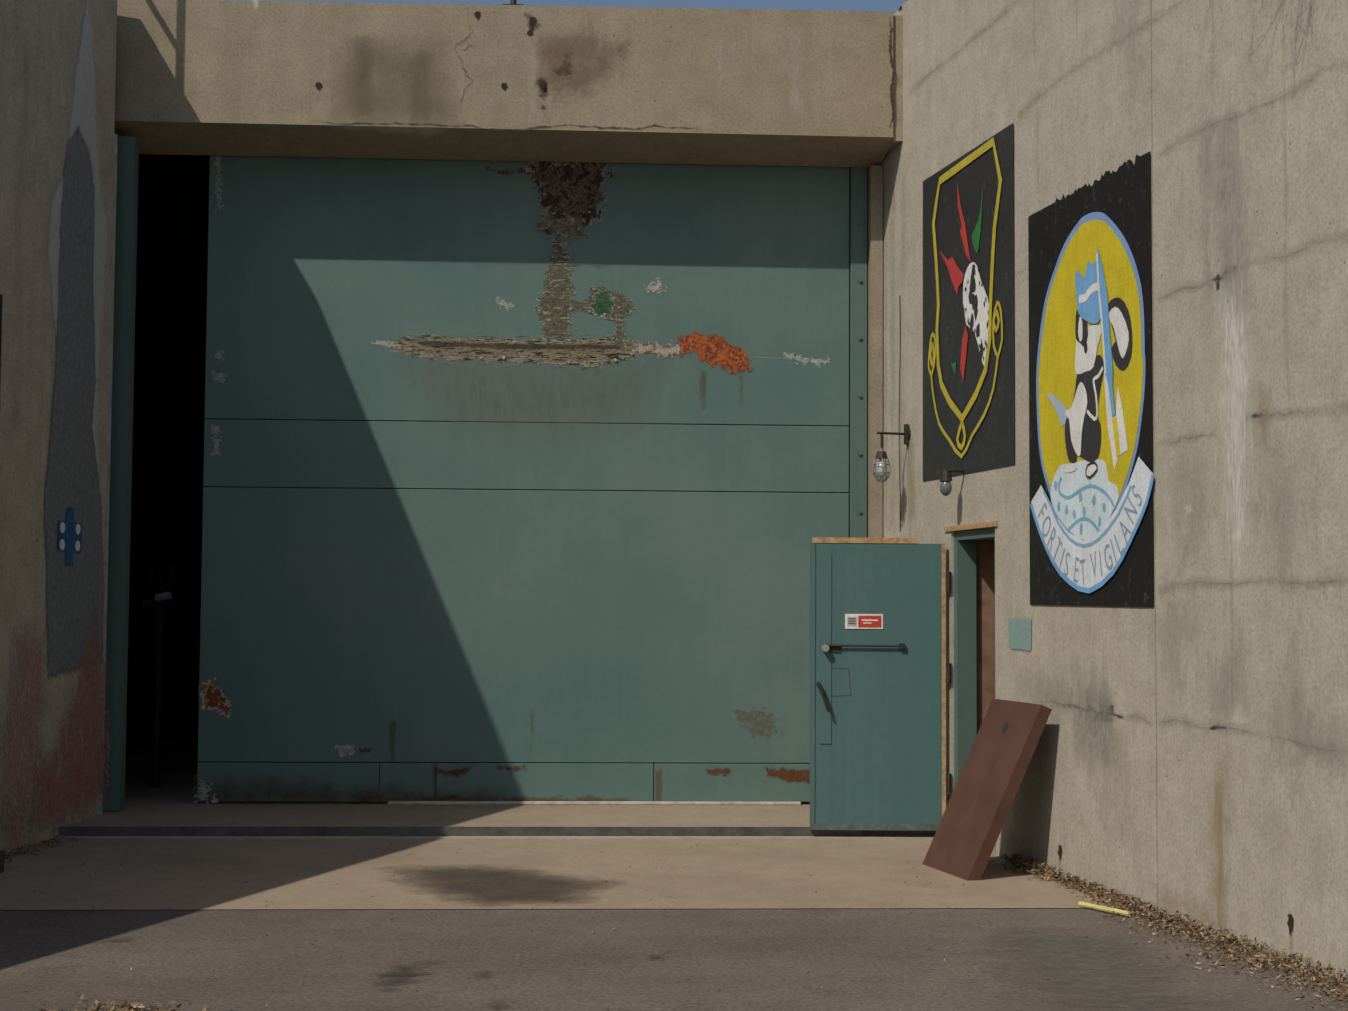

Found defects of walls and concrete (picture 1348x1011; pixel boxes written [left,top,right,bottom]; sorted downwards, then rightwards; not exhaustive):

crack [326,24,709,132]
crack [888,17,896,127]
peeling [371,161,643,371]
peeling [644,277,668,296]
corrosion [632,331,753,374]
corrosion [766,767,810,782]